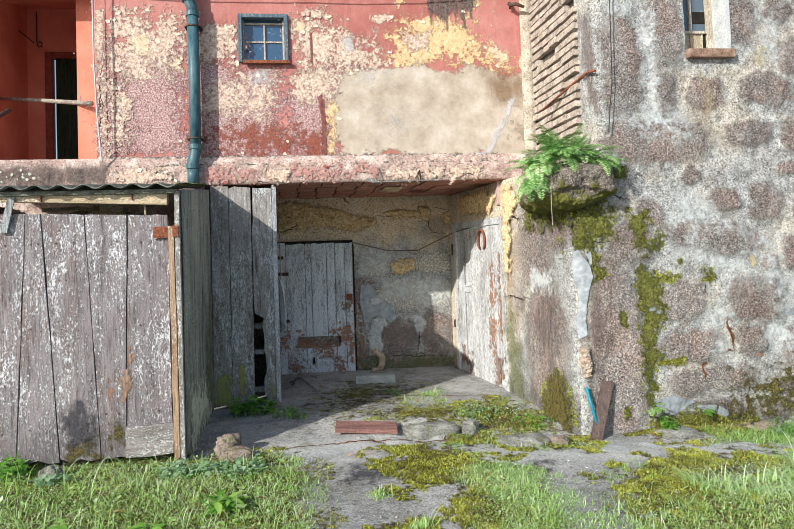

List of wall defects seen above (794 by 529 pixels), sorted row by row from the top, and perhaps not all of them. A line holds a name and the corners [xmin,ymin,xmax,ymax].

damp [427,0,475,31]
peeling [79,0,190,184]
peeling [198,0,522,388]
damp [766,324,794,352]
damp [714,361,794,422]
damp [60,401,126,466]